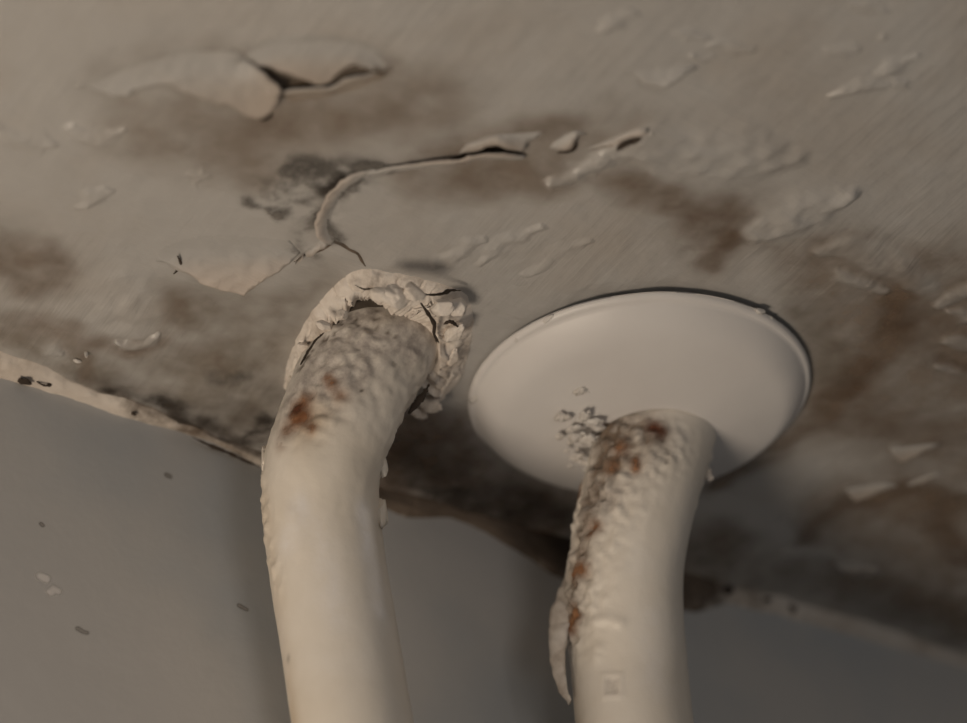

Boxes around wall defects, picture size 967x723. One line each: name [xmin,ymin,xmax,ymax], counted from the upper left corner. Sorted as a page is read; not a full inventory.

peeling [75,35,393,122]
crack [361,127,649,182]
mould [279,157,392,197]
mould [243,199,287,220]
peeling [156,235,328,296]
hole [349,299,383,312]
mould [157,397,210,428]
rust [289,396,315,432]
rust [647,422,666,437]
peeling [841,471,943,502]
rust [568,608,580,633]
peeling [548,577,572,705]